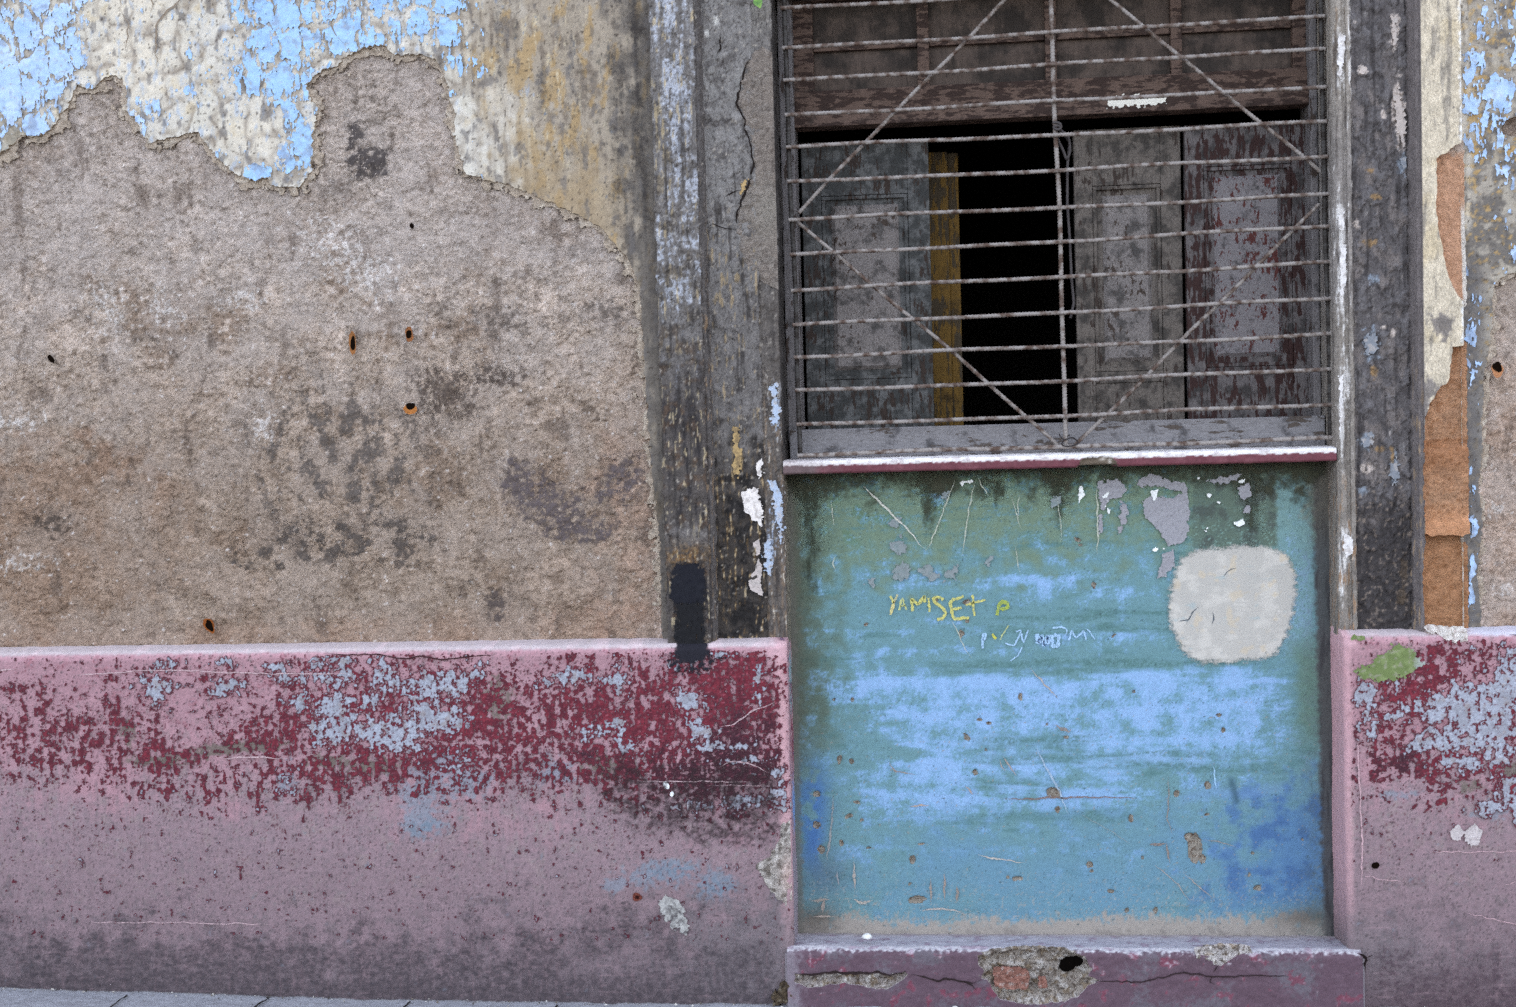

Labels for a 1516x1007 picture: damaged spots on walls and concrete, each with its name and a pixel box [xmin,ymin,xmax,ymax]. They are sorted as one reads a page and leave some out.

peeling [1337,33,1367,79]
crack [708,37,755,230]
peeling [1337,211,1347,295]
spalling [0,0,794,943]
spalling [1350,0,1516,866]
peeling [863,516,959,602]
peeling [1050,473,1252,578]
peeling [1343,534,1353,558]
spalling [771,971,908,1006]
crack [795,970,980,989]
spalling [978,945,1098,1004]